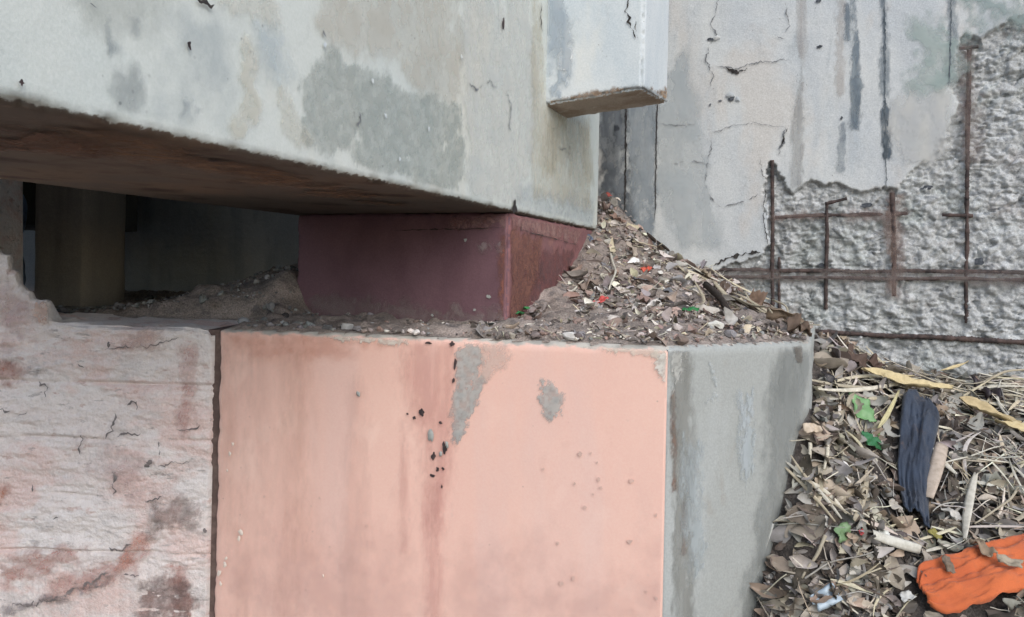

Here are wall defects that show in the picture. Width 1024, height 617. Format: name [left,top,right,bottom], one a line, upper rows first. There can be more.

crack [705,3,790,84]
leakage [845,0,863,129]
leakage [880,38,892,159]
crack [662,122,788,265]
spalling [711,18,1024,378]
crack [78,400,200,467]
crack [105,337,179,350]
peeling [428,341,486,488]
peeling [537,379,563,421]
crack [10,544,139,611]